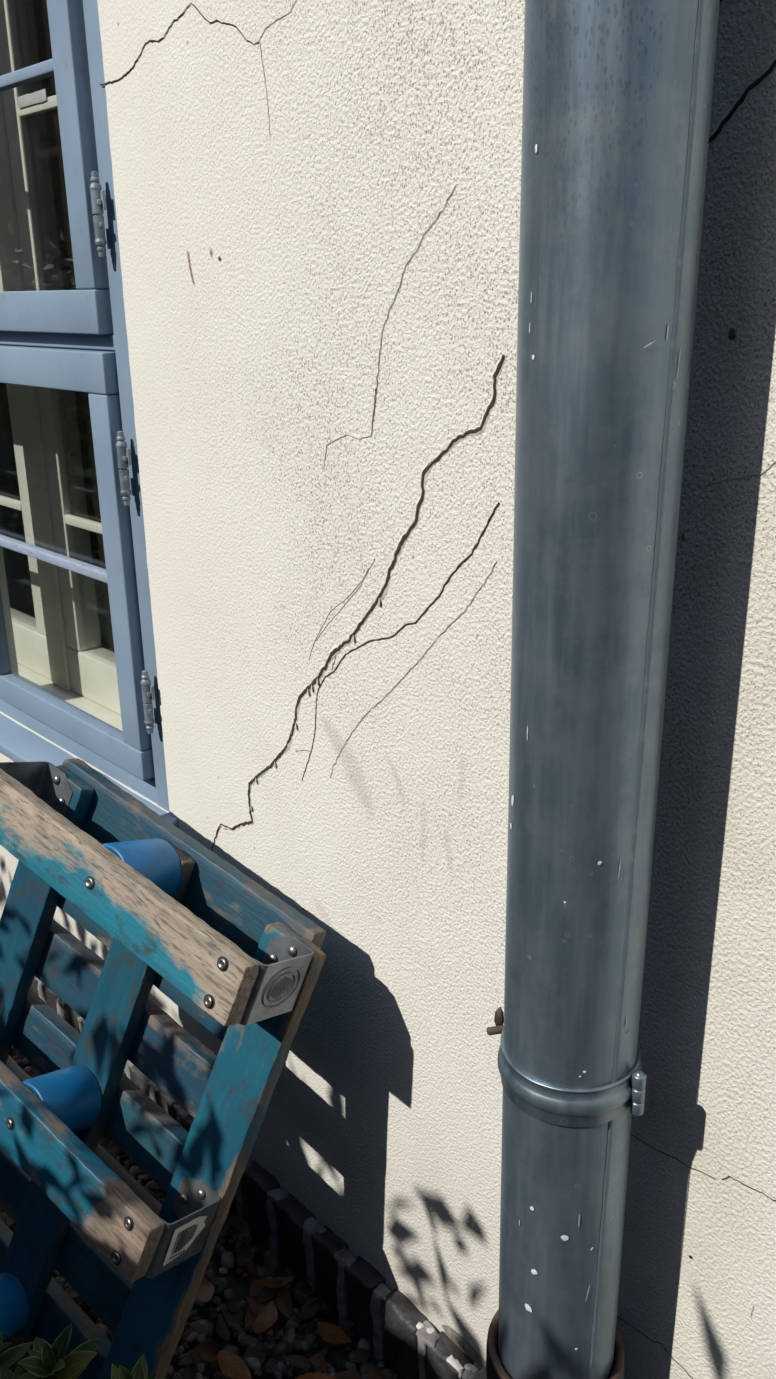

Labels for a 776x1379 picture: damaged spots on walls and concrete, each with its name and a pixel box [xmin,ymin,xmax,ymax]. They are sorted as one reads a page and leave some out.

crack [100,1,296,134]
crack [708,51,776,148]
crack [211,354,507,851]
crack [630,1134,776,1201]